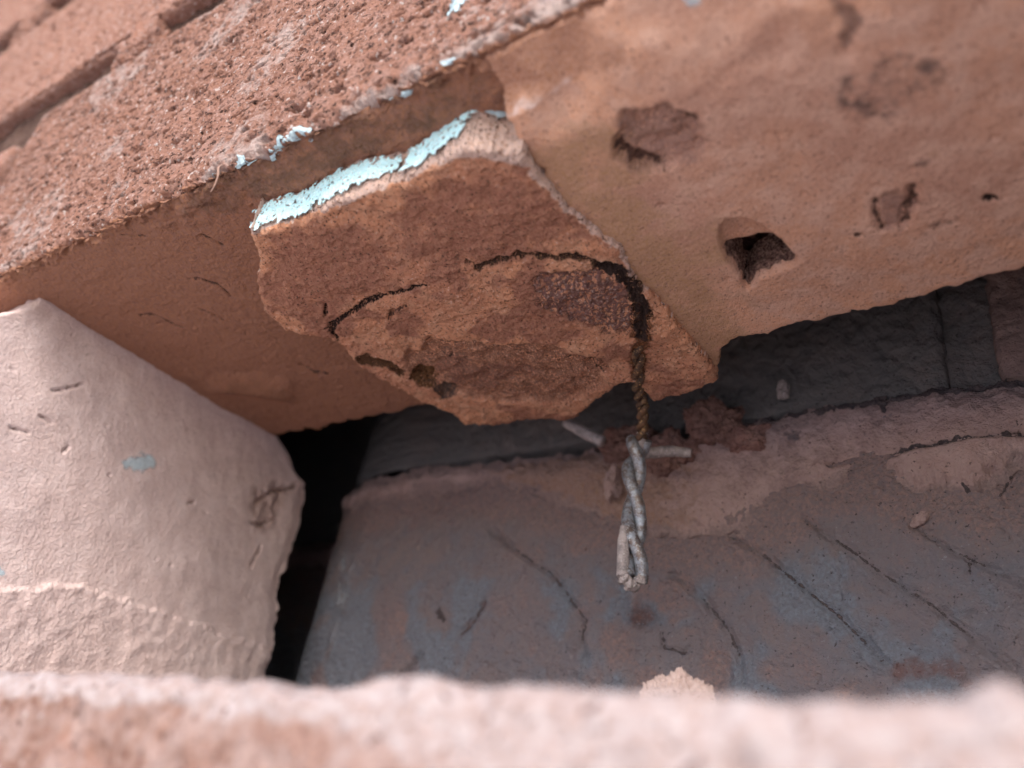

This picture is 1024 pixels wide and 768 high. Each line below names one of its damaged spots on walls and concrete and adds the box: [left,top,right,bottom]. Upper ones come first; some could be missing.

spalling [613,103,702,172]
spalling [873,183,918,228]
crack [323,284,427,341]
crack [465,250,653,342]